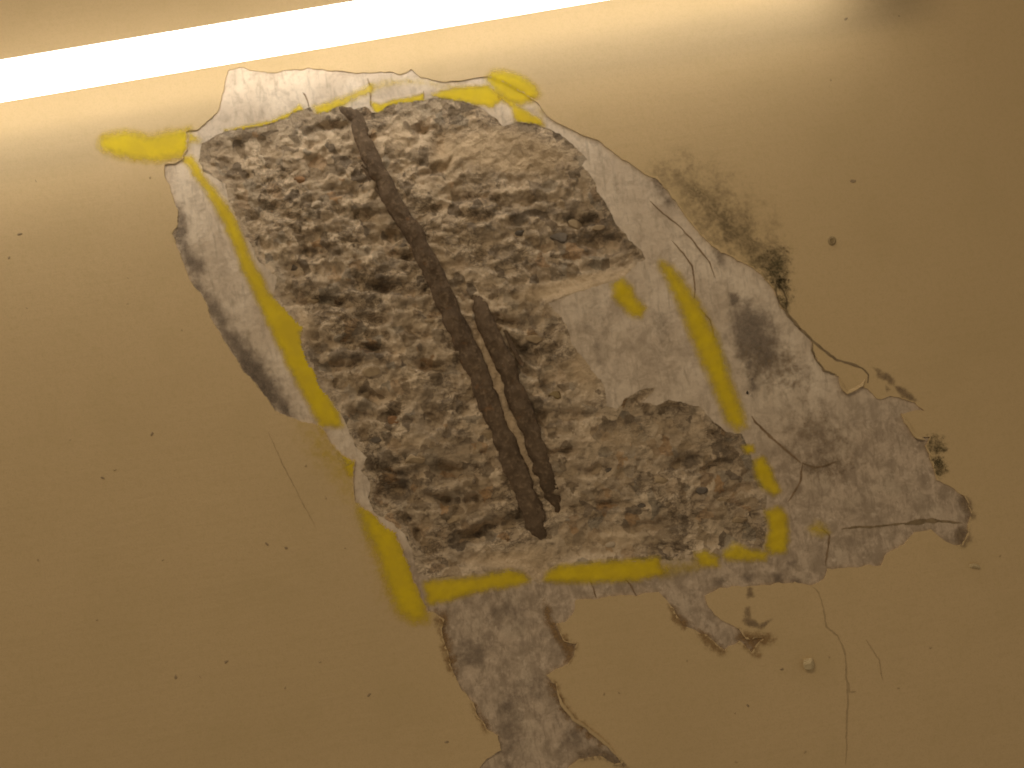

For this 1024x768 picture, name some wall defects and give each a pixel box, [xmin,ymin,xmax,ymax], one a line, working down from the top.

water stain [751,247,791,309]
spalling [165,67,971,768]
crack [813,518,961,764]